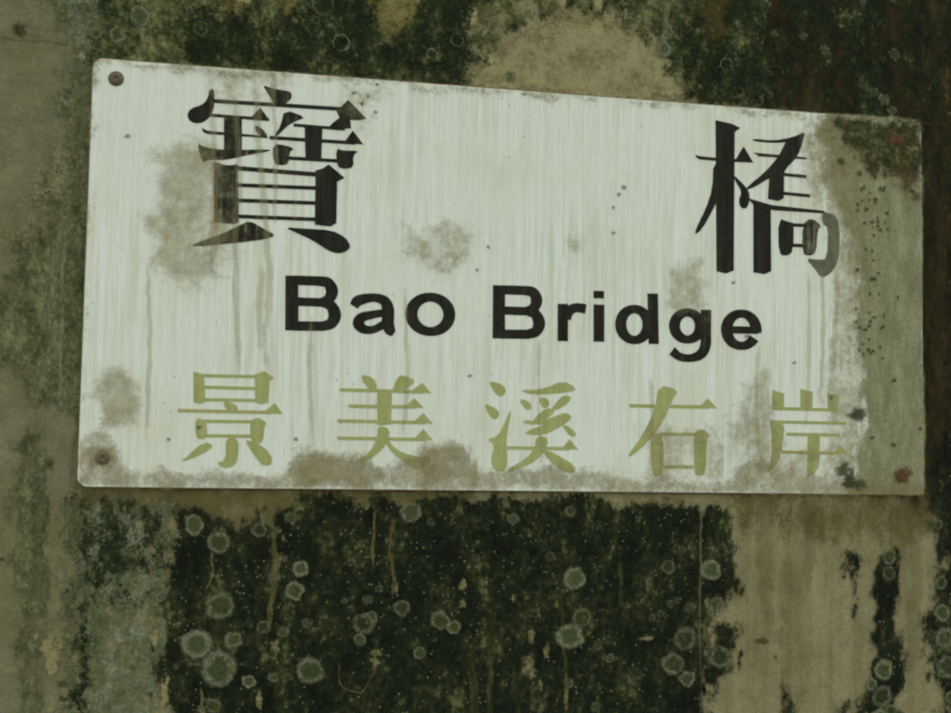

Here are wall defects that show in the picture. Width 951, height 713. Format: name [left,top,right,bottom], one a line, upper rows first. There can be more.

leakage [731,0,951,541]
leakage [79,488,475,630]